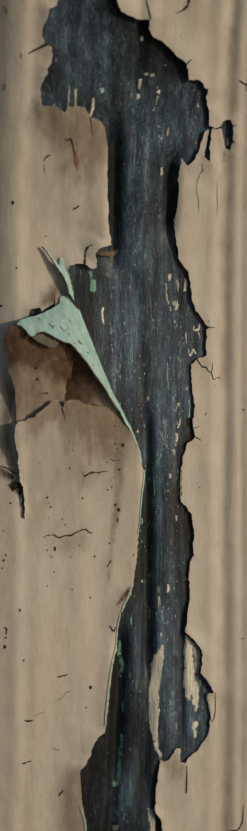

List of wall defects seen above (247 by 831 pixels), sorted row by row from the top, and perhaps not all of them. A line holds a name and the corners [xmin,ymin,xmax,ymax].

peeling [29,298,55,317]
crack [197,360,221,388]
water stain [27,400,129,439]
peeling [40,0,234,831]
crack [82,459,120,485]
crack [44,528,93,538]